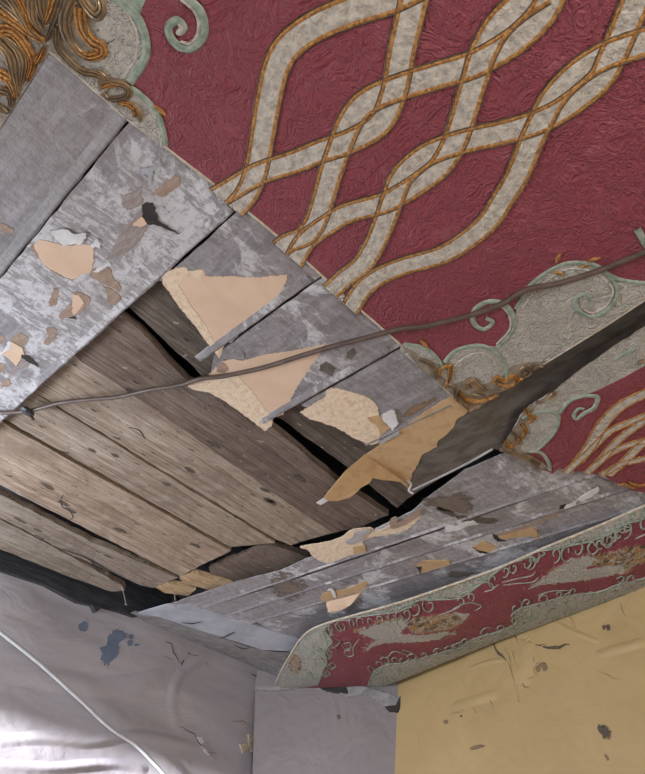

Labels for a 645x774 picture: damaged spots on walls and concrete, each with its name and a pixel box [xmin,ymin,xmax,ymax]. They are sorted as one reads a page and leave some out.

peeling [30,175,180,306]
peeling [48,288,91,320]
peeling [43,327,57,345]
peeling [0,332,39,388]
peeling [367,410,400,444]
peeling [445,520,478,533]
crack [63,549,125,581]
crack [165,642,209,666]
crack [493,635,570,702]